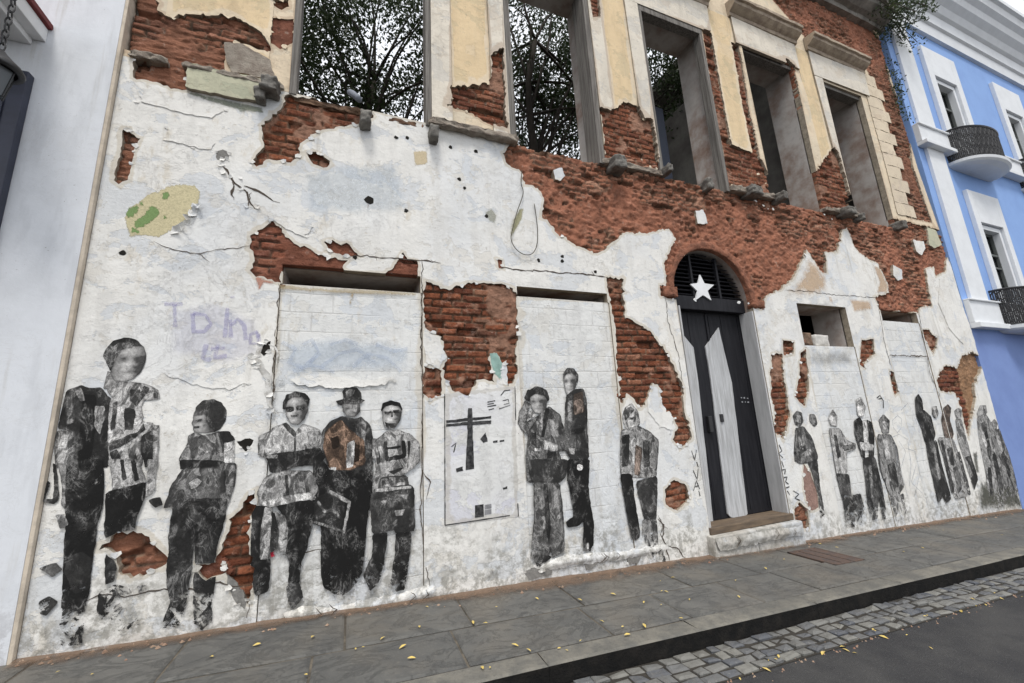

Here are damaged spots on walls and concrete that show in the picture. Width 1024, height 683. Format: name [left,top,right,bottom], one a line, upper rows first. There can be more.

spalling [128,0,294,118]
spalling [447,53,507,128]
spalling [116,127,139,184]
crack [216,157,280,209]
spalling [249,97,360,168]
spalling [250,204,357,288]
spalling [504,0,979,448]
spalling [386,254,522,401]
spalling [665,480,691,510]
spalling [102,531,168,576]
spalling [191,490,257,609]